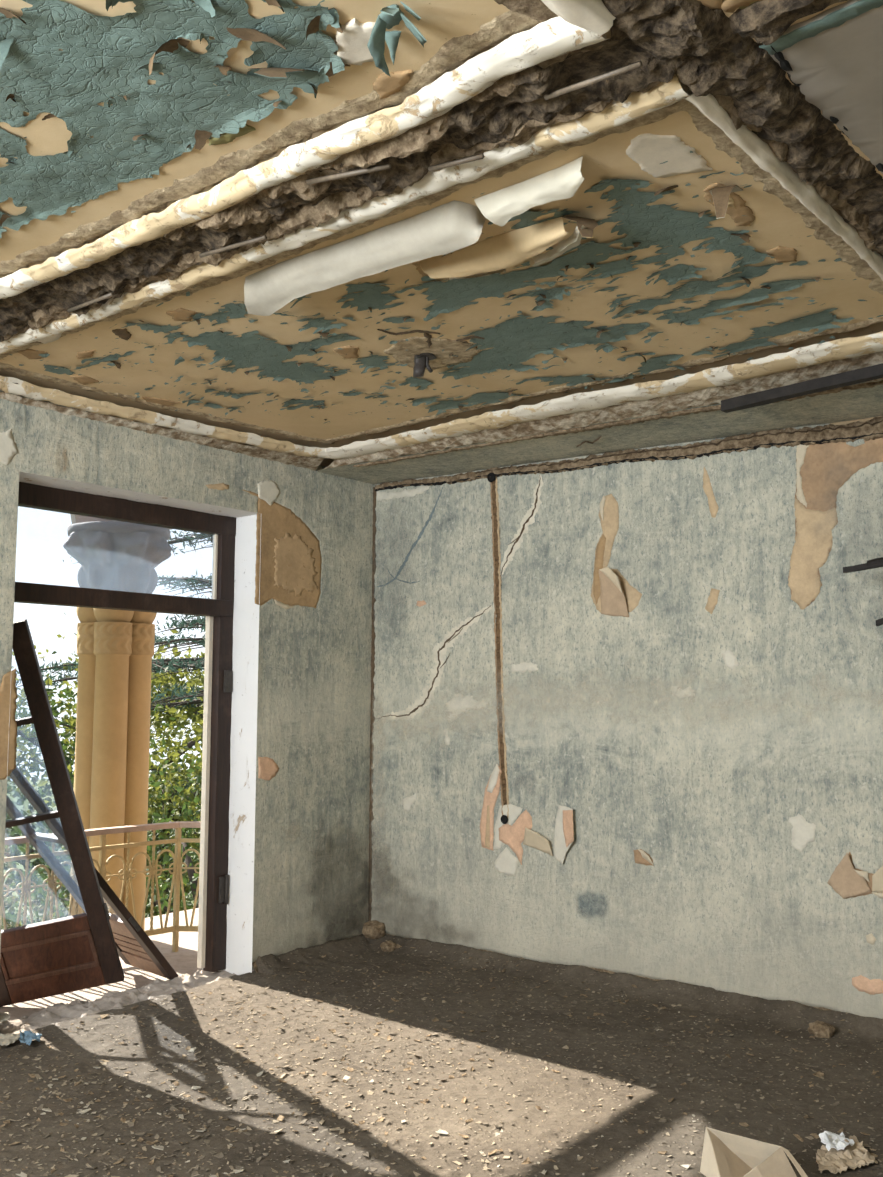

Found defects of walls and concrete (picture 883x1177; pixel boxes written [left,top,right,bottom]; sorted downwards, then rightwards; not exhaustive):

peeling [0,0,883,423]
spalling [353,404,721,467]
peeling [243,480,322,609]
crack [500,475,544,575]
peeling [0,668,18,780]
crack [368,487,493,921]
spalling [375,416,883,876]
peeling [827,852,883,899]